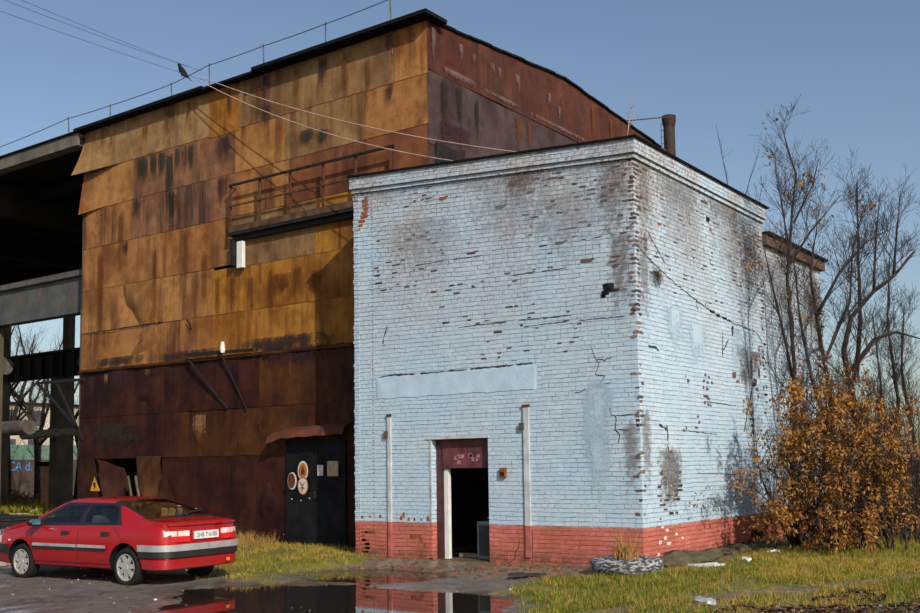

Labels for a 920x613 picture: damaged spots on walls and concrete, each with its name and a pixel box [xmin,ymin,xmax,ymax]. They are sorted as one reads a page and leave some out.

rust [269,267,321,312]
peeling [373,229,444,291]
crack [459,315,624,328]
peeling [504,158,671,339]
crack [639,232,763,356]
crack [574,347,631,444]
peeling [630,363,645,430]
leakage [661,451,679,486]